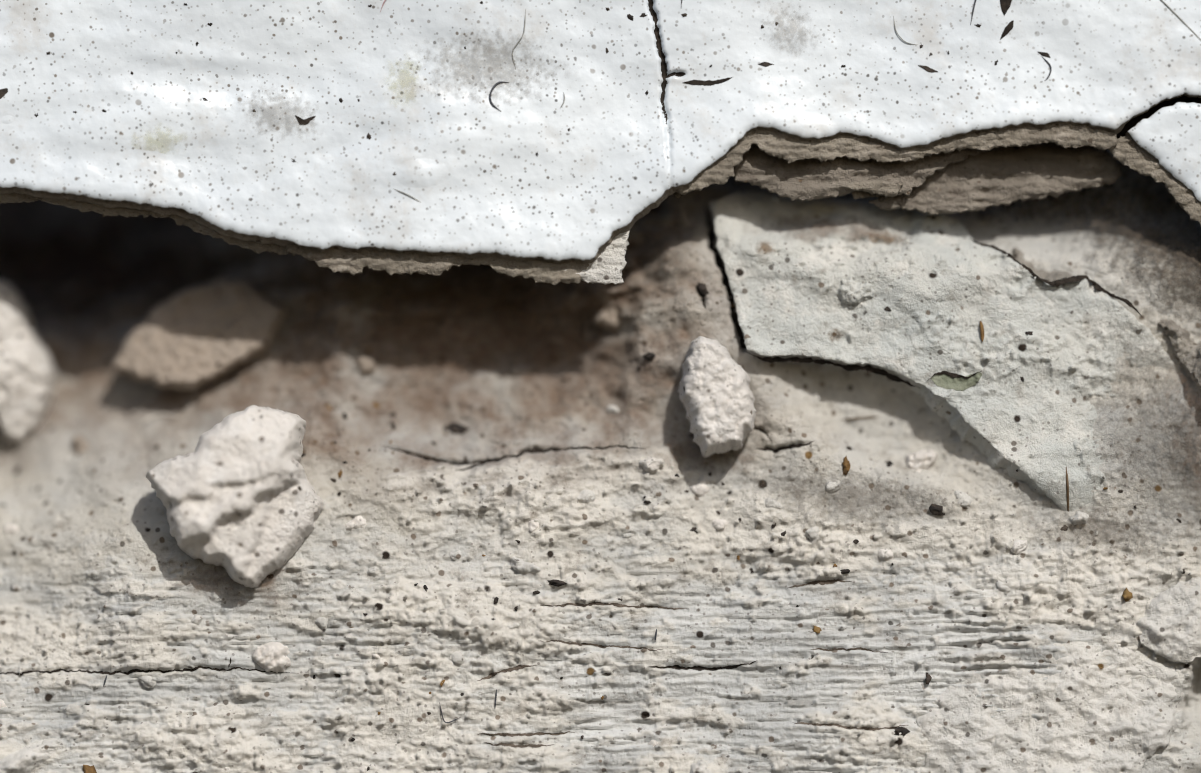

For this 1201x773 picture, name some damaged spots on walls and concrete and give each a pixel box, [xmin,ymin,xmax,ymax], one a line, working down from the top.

crack [648,0,732,125]
peeling [0,0,1201,285]
crack [1116,96,1201,139]
flaking render [110,277,286,391]
crack [696,204,981,388]
peeling [930,372,982,391]
crack [954,222,1143,318]
crack [381,445,646,471]
crack [753,426,813,453]